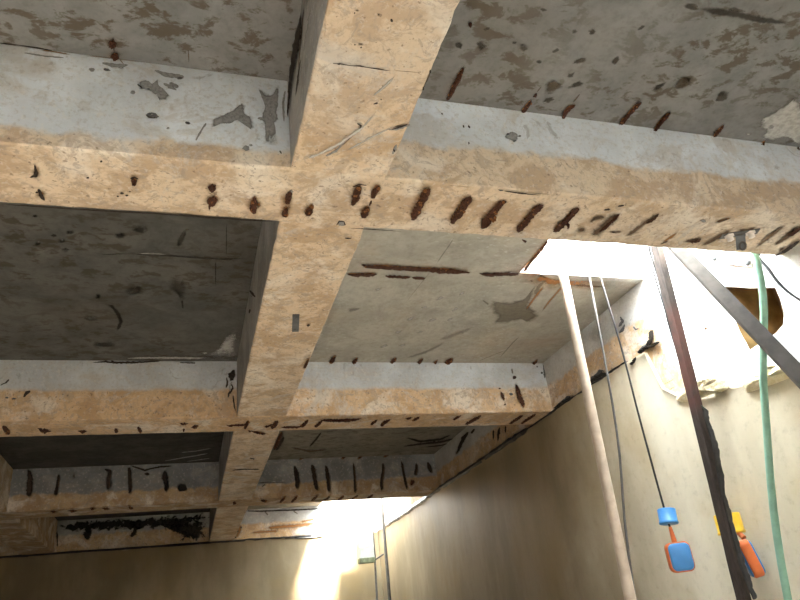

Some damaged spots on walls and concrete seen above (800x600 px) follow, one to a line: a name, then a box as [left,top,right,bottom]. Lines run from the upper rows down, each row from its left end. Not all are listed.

crack [333,63,409,72]
peeling [131,70,183,99]
peeling [196,89,286,141]
crack [326,123,362,156]
corrosion [207,184,218,210]
corrosion [351,184,380,218]
corrosion [411,188,431,220]
corrosion [450,197,472,224]
corrosion [481,201,506,229]
corrosion [516,204,544,243]
corrosion [553,208,659,236]
corrosion [347,240,600,309]